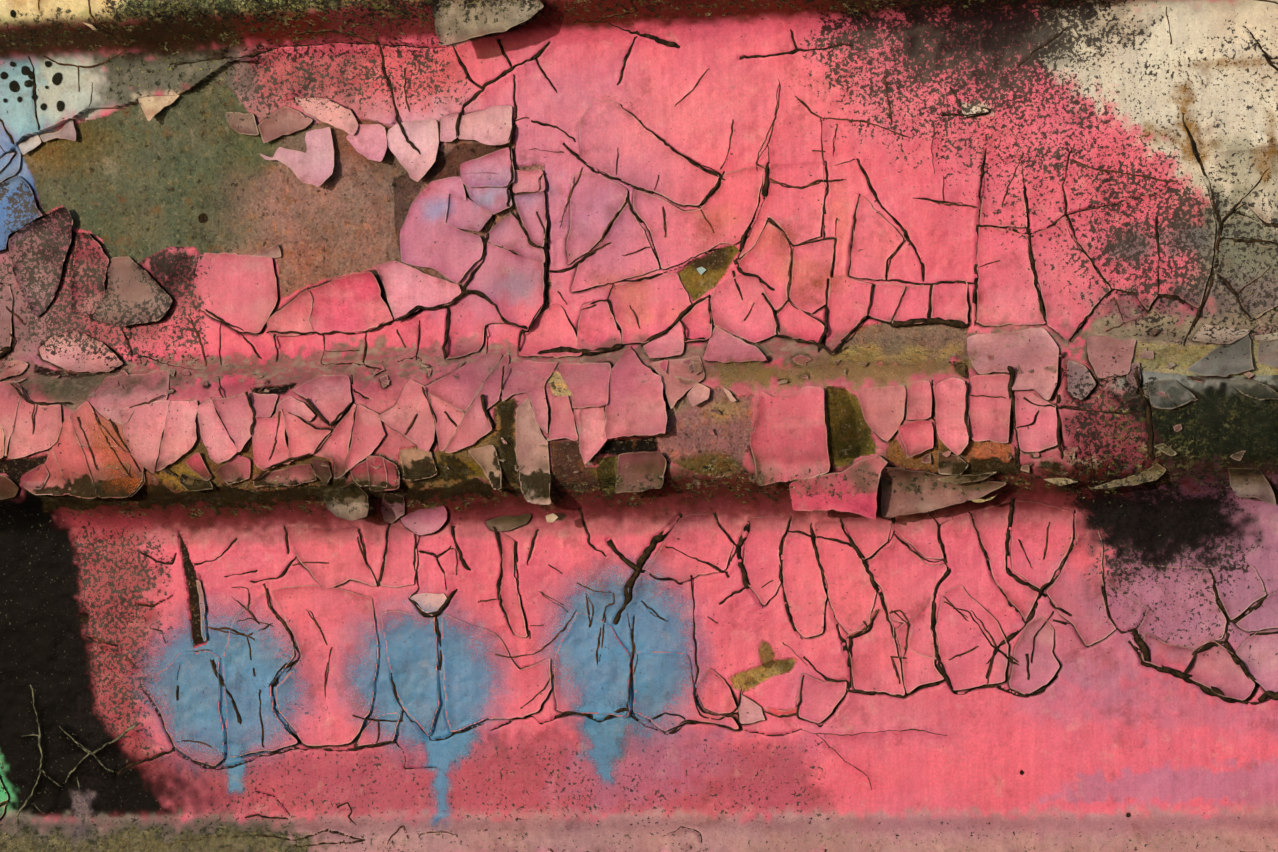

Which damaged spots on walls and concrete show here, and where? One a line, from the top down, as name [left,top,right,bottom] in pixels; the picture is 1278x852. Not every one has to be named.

crack [0,0,133,153]
crack [121,0,1278,486]
peeling [976,146,1278,340]
crack [0,283,164,478]
peeling [0,79,1061,766]
peeling [1044,478,1078,486]
peeling [1091,443,1177,489]
peeling [1067,324,1278,409]
peeling [1228,451,1276,506]
crack [0,498,1089,832]
peeling [972,501,1278,700]
crack [1101,569,1278,705]